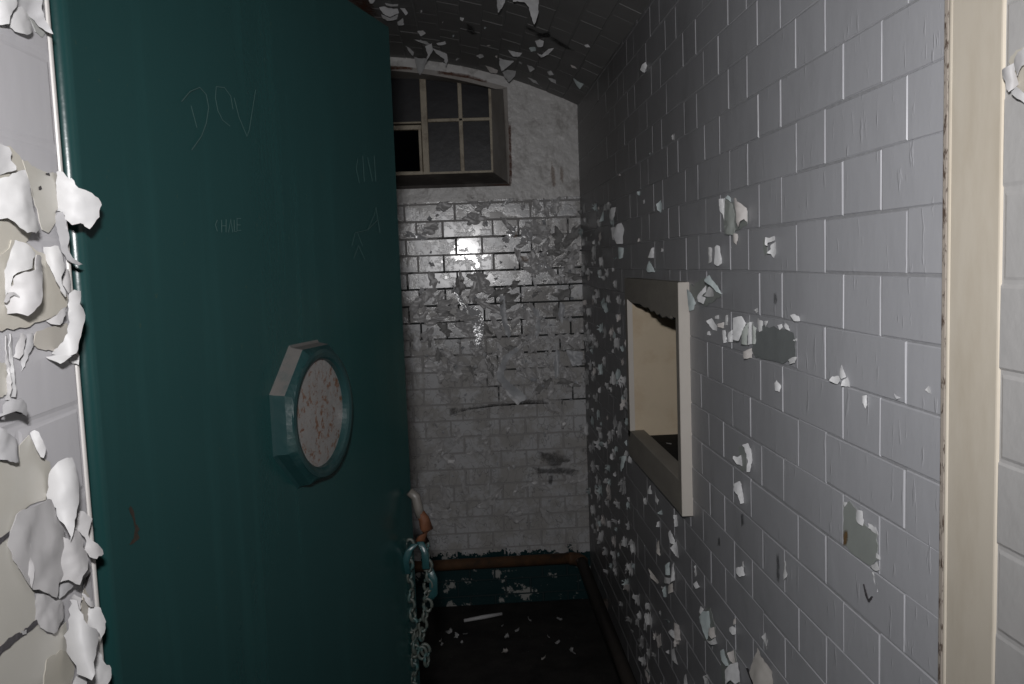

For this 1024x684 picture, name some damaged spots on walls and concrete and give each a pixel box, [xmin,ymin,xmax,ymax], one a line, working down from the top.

peeling [0,0,53,37]
peeling [369,0,408,25]
peeling [497,0,539,24]
peeling [477,39,556,85]
peeling [719,195,748,245]
peeling [687,245,722,311]
peeling [706,308,800,364]
peeling [0,143,112,684]
peeling [405,194,688,684]
peeling [733,443,752,523]
peeling [843,501,880,592]
peeling [699,606,773,684]